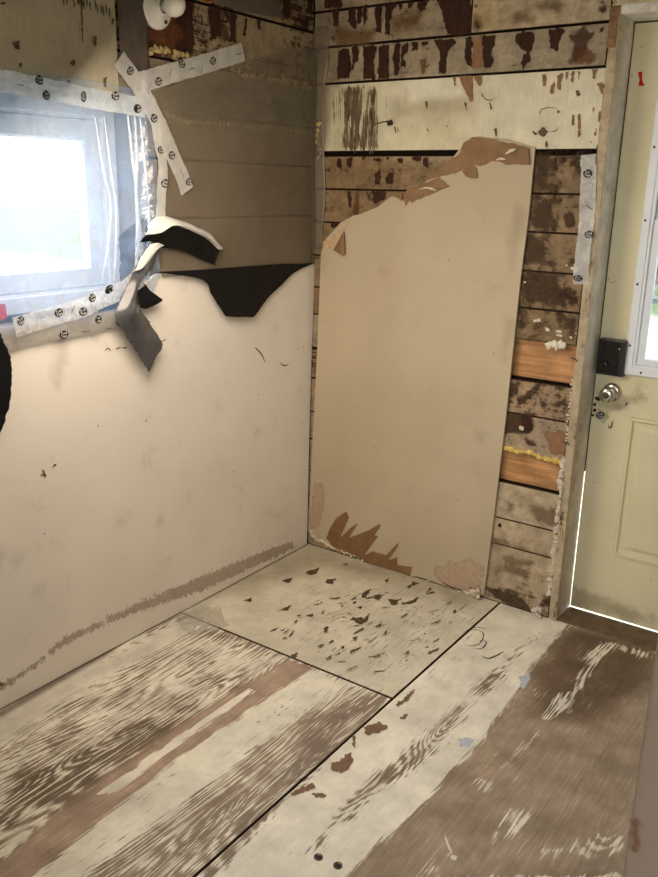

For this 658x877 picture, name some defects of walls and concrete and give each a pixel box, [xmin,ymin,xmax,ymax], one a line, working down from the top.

peeling [63,0,114,46]
peeling [174,3,195,54]
peeling [208,5,261,43]
peeling [515,31,534,69]
peeling [542,25,605,97]
peeling [324,0,496,215]
flaking render [309,531,363,565]
peeling [270,574,437,670]